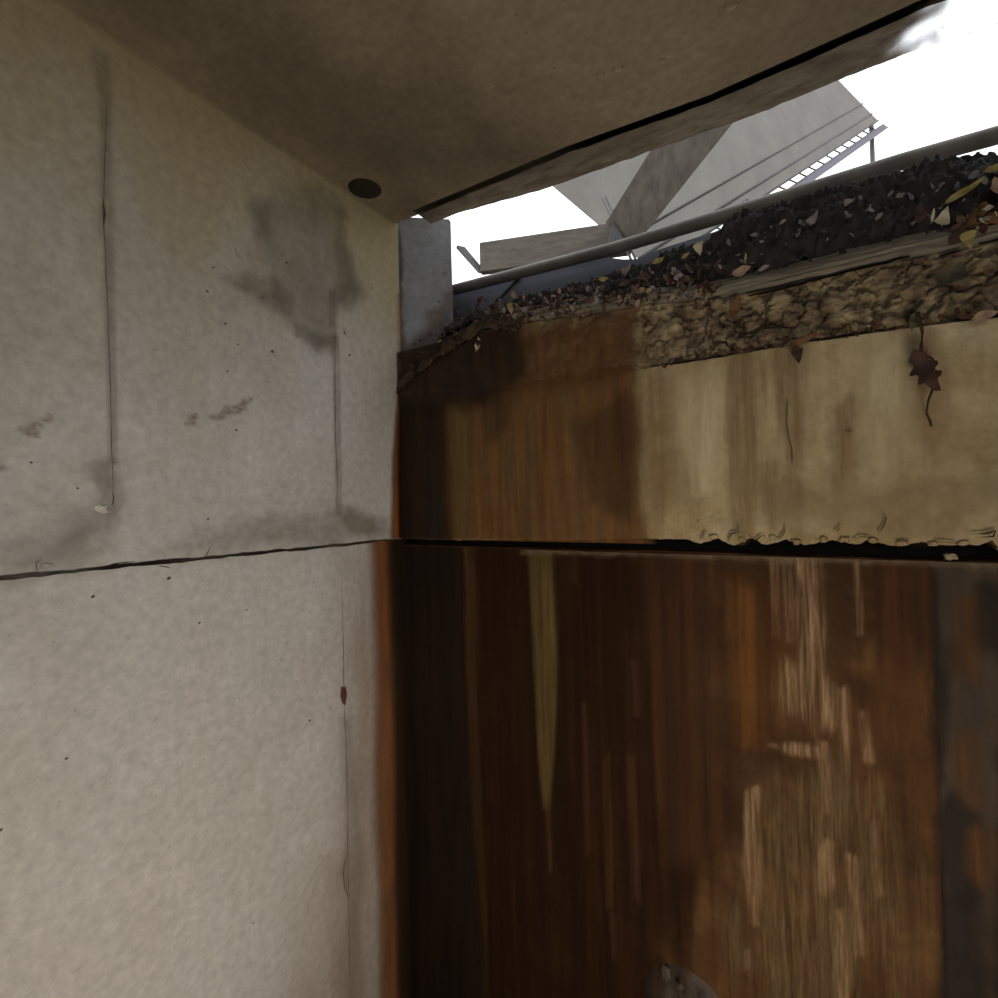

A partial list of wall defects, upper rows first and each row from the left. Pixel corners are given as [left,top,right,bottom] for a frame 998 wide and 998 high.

crack [103,99,114,506]
spalling [480,239,998,372]
rust [443,309,647,544]
crack [0,539,395,581]
spalling [702,524,802,545]
spalling [819,512,887,544]
spalling [926,540,970,561]